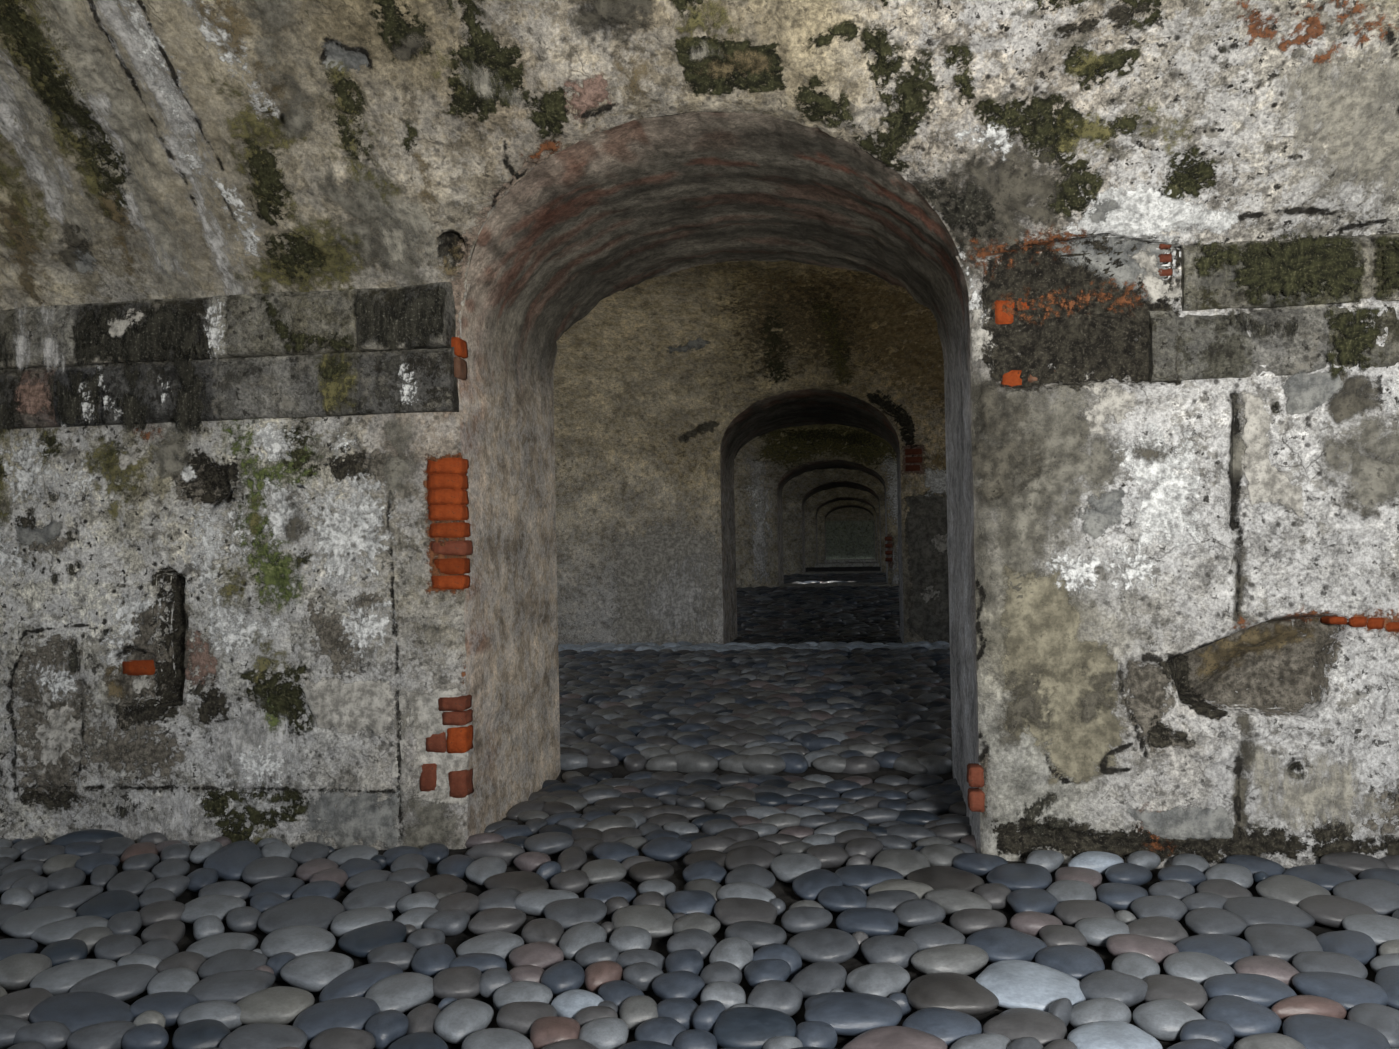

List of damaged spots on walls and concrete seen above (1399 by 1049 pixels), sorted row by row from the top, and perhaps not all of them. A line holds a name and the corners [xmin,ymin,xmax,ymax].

crack [88,0,236,221]
leakage [0,0,451,579]
spalling [15,601,229,813]
spalling [116,803,134,818]
leakage [99,589,166,678]
flaking render [967,226,1399,864]
crack [1229,391,1250,621]